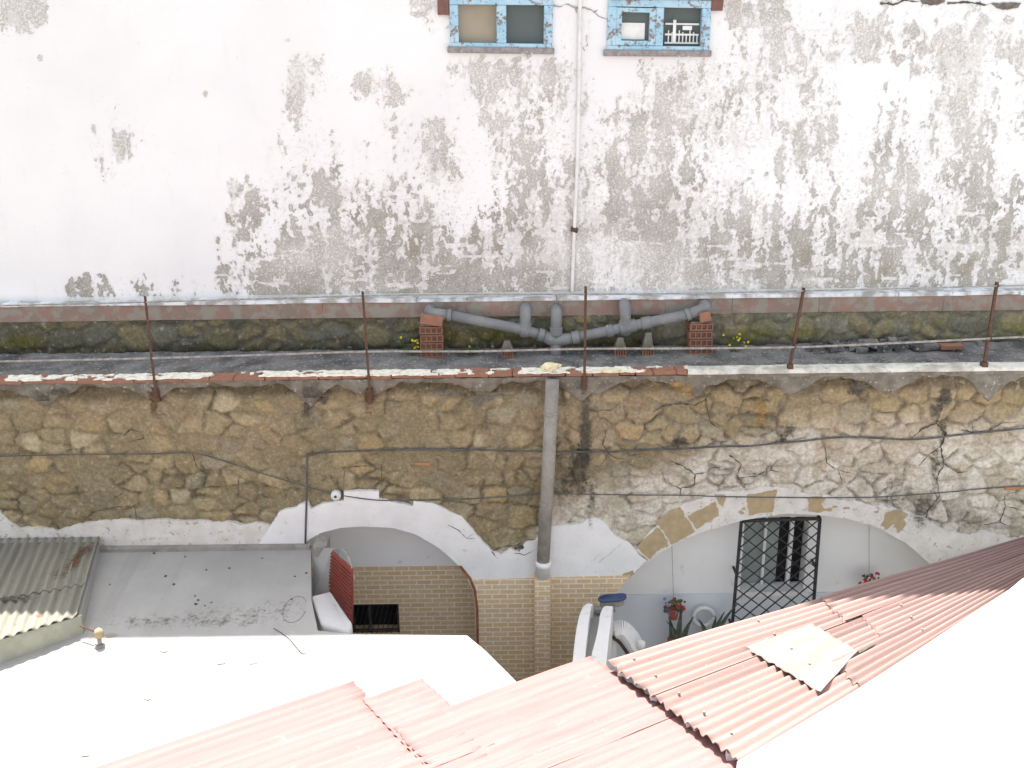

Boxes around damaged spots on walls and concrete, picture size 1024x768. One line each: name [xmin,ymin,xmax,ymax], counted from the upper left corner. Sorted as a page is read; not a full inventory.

peeling [0,0,49,35]
peeling [112,128,134,160]
peeling [215,0,1024,295]
peeling [65,272,115,297]
peeling [131,274,181,296]
crack [653,393,720,429]
leakage [561,398,594,507]
crack [661,455,783,495]
crack [912,407,1016,518]
crack [984,491,1023,528]